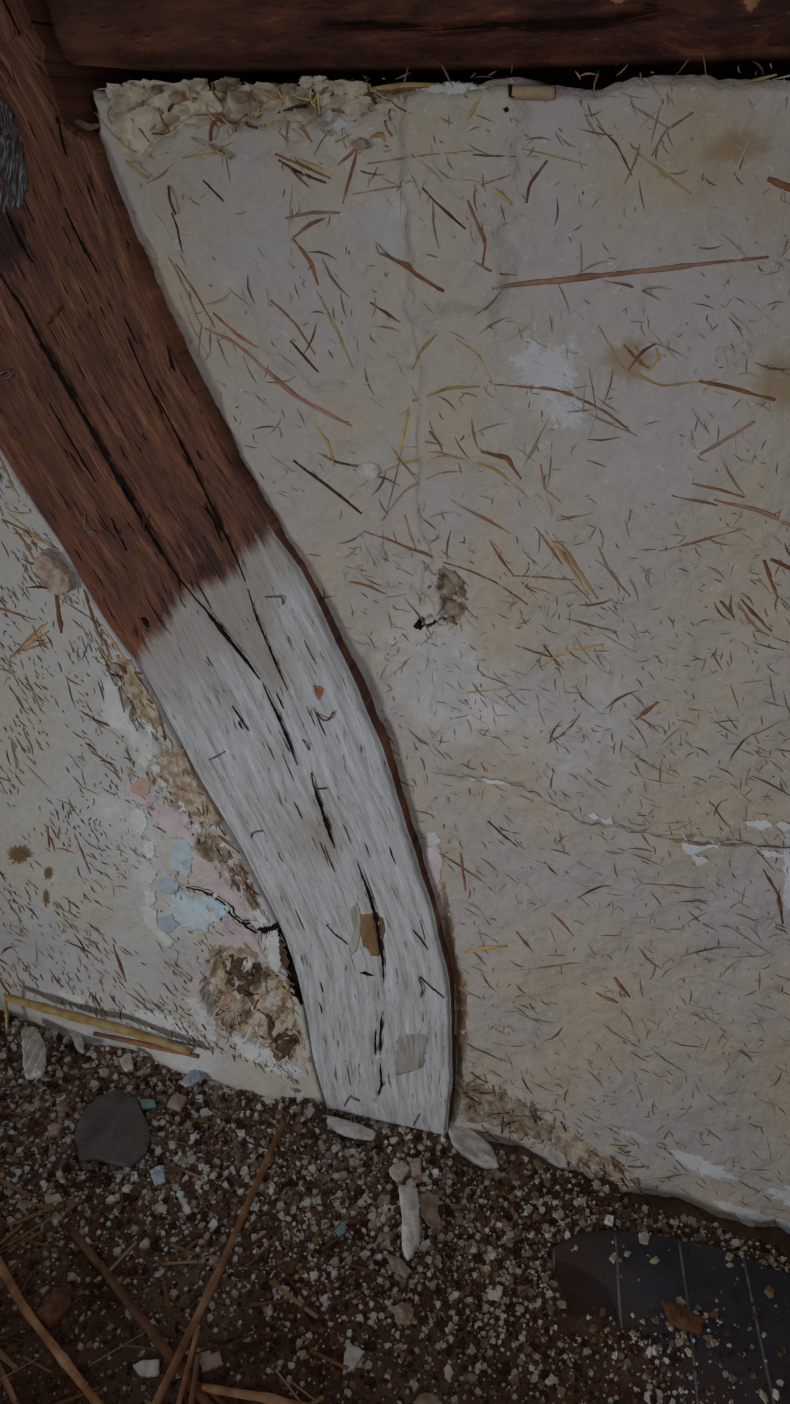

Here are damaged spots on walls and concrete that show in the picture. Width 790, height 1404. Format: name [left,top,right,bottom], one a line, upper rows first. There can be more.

flaking render [105,75,393,179]
flaking render [413,565,468,631]
peeling [100,655,311,1068]
peeling [58,992,86,1005]